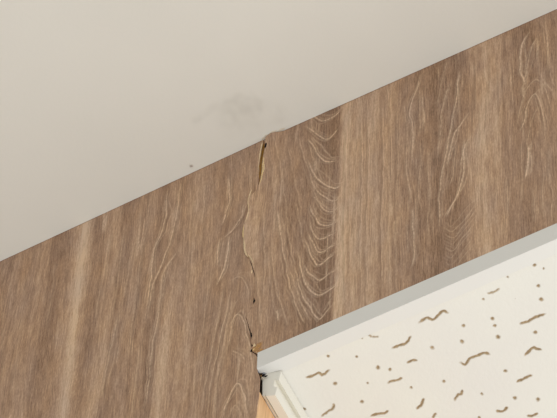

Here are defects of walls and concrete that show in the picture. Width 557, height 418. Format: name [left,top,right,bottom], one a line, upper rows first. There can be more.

crack [257,140,267,189]